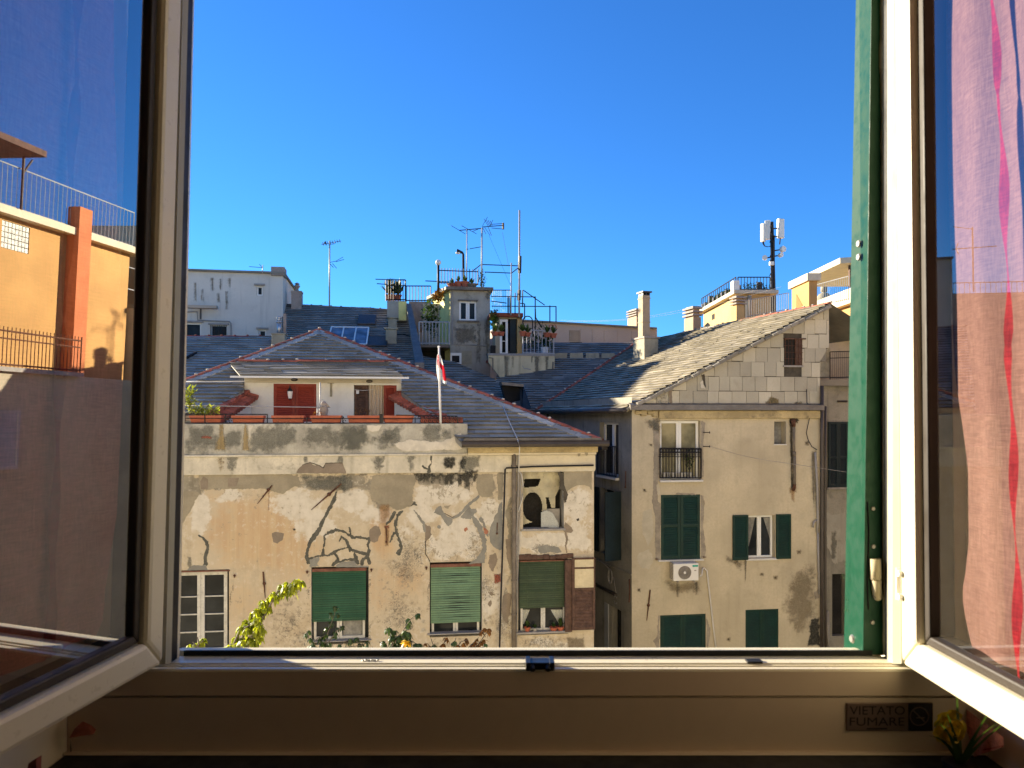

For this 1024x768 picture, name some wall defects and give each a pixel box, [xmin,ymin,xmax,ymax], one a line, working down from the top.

leakage [186,424,399,470]
leakage [424,425,450,440]
peeling [183,456,346,522]
crack [187,535,209,571]
crack [305,491,417,567]
peeling [370,474,503,571]
leakage [789,569,813,629]